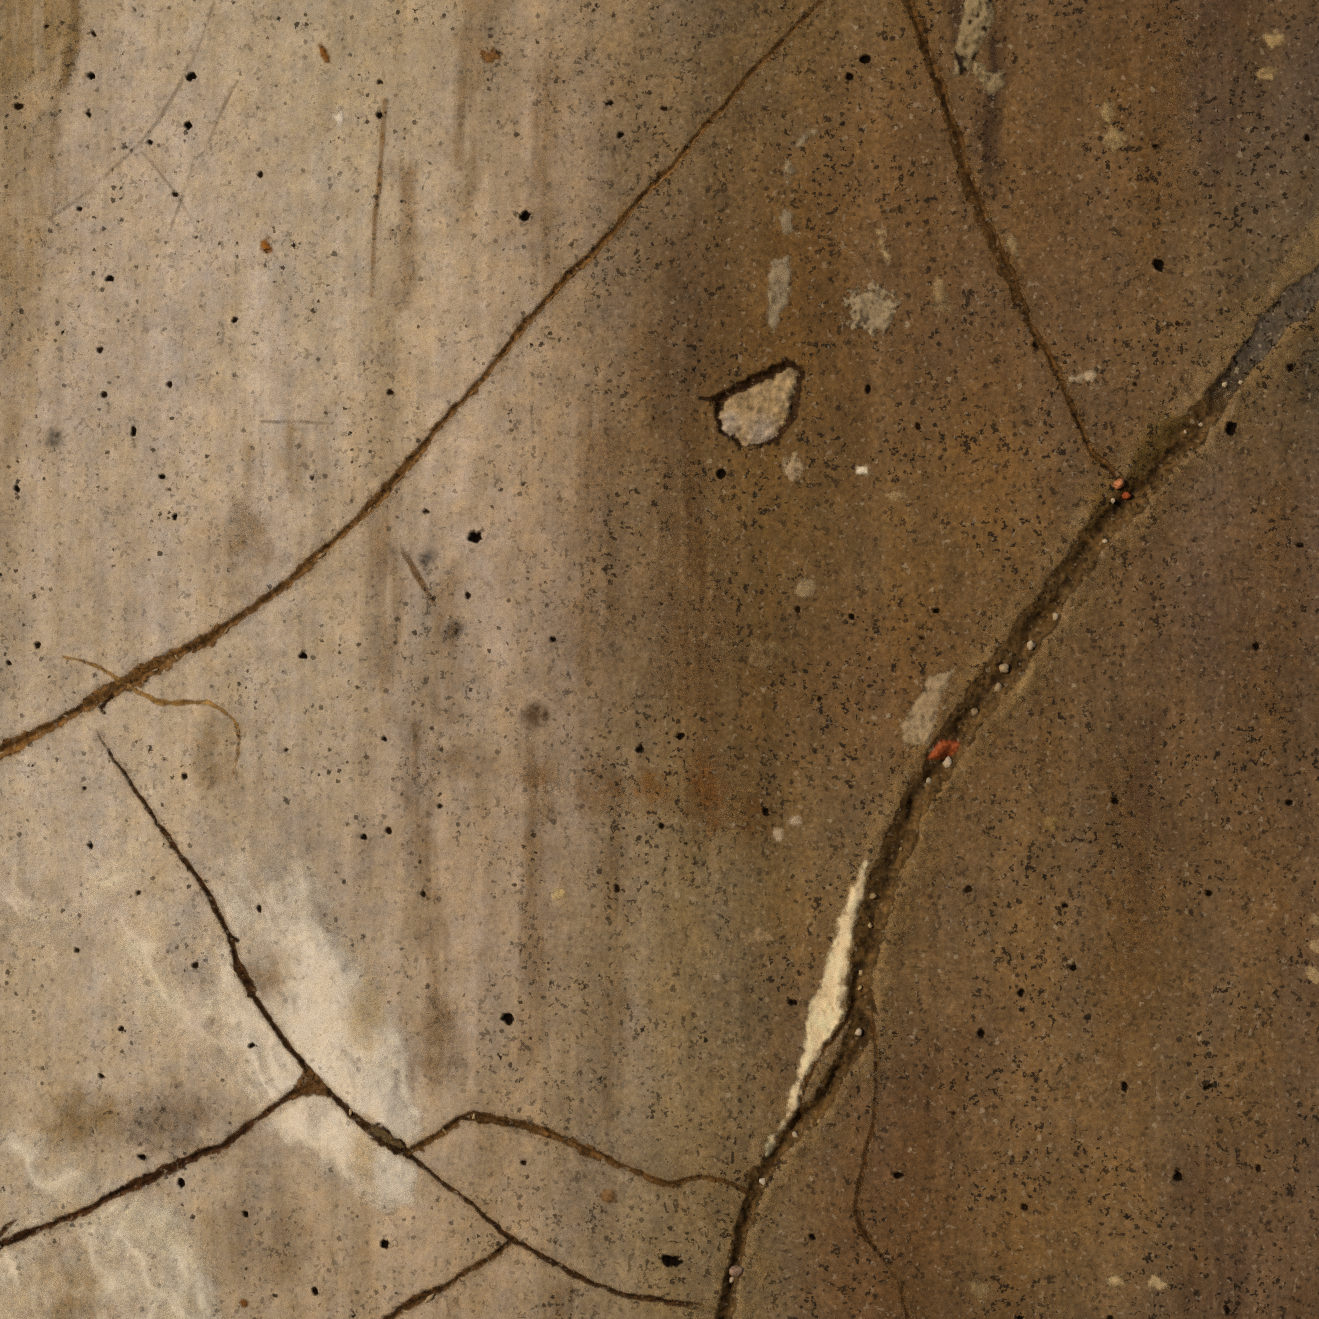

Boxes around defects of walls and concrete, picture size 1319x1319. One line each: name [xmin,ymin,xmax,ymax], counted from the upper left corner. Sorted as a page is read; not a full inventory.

crack [0,749,754,1319]
crack [0,0,825,774]
spalling [699,357,804,482]
crack [701,0,1319,1319]